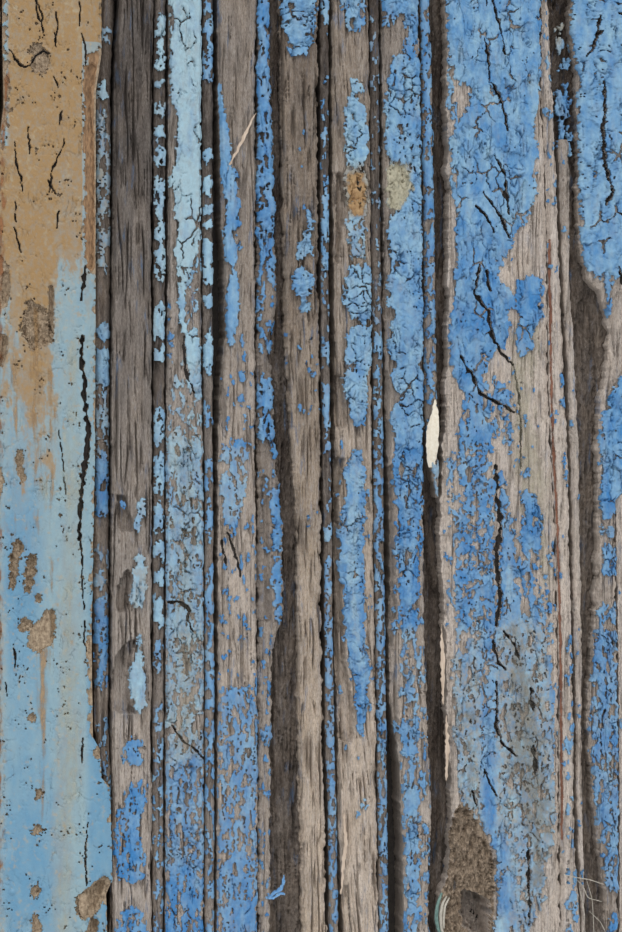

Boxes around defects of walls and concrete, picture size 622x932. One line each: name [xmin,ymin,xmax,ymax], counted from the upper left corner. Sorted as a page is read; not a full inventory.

crack [8,0,87,68]
crack [485,0,508,131]
crack [586,13,622,57]
crack [14,127,31,252]
crack [48,111,65,229]
crack [475,160,510,238]
crack [600,83,622,214]
peeling [0,0,283,932]
peeling [254,0,622,932]
crack [460,266,538,774]